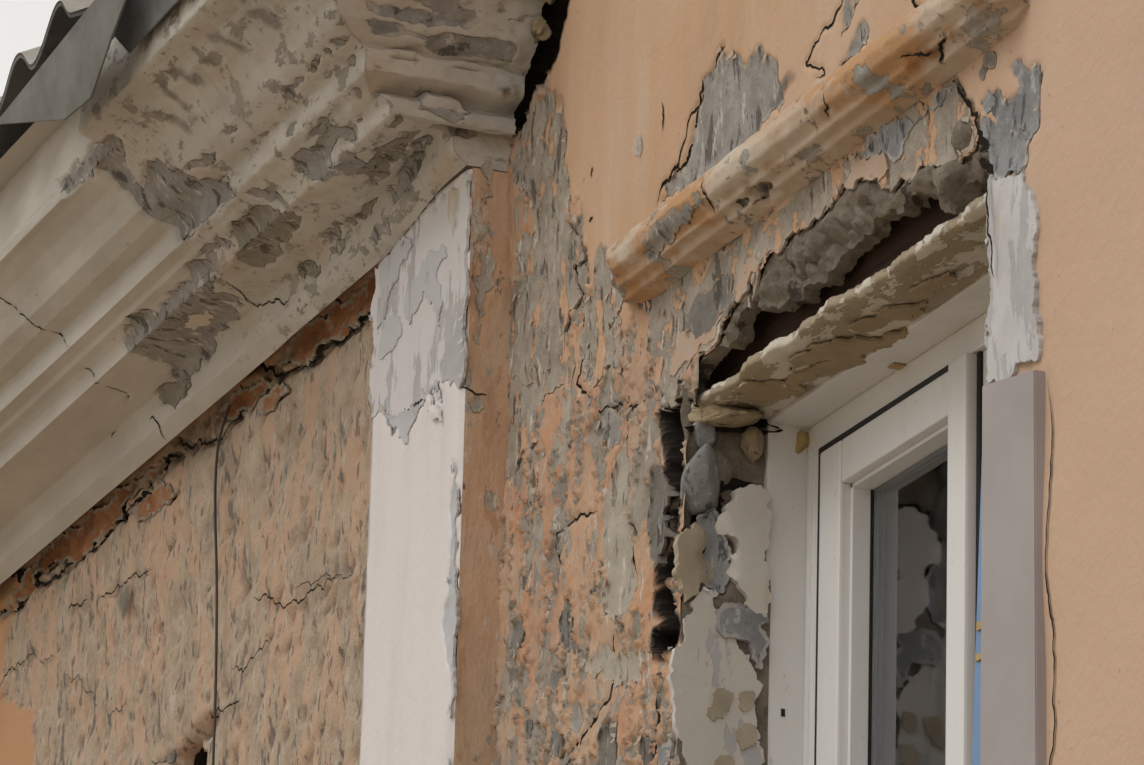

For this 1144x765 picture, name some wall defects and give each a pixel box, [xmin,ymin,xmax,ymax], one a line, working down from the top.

peeling [366,0,516,62]
crack [514,0,569,129]
crack [805,4,842,116]
flaking render [60,134,301,409]
crack [255,313,371,378]
peeling [213,87,497,444]
peeling [505,91,628,600]
peeling [638,44,1043,413]
crack [0,416,245,615]
crack [253,572,353,609]
peeling [597,408,680,623]
crack [1045,389,1056,765]